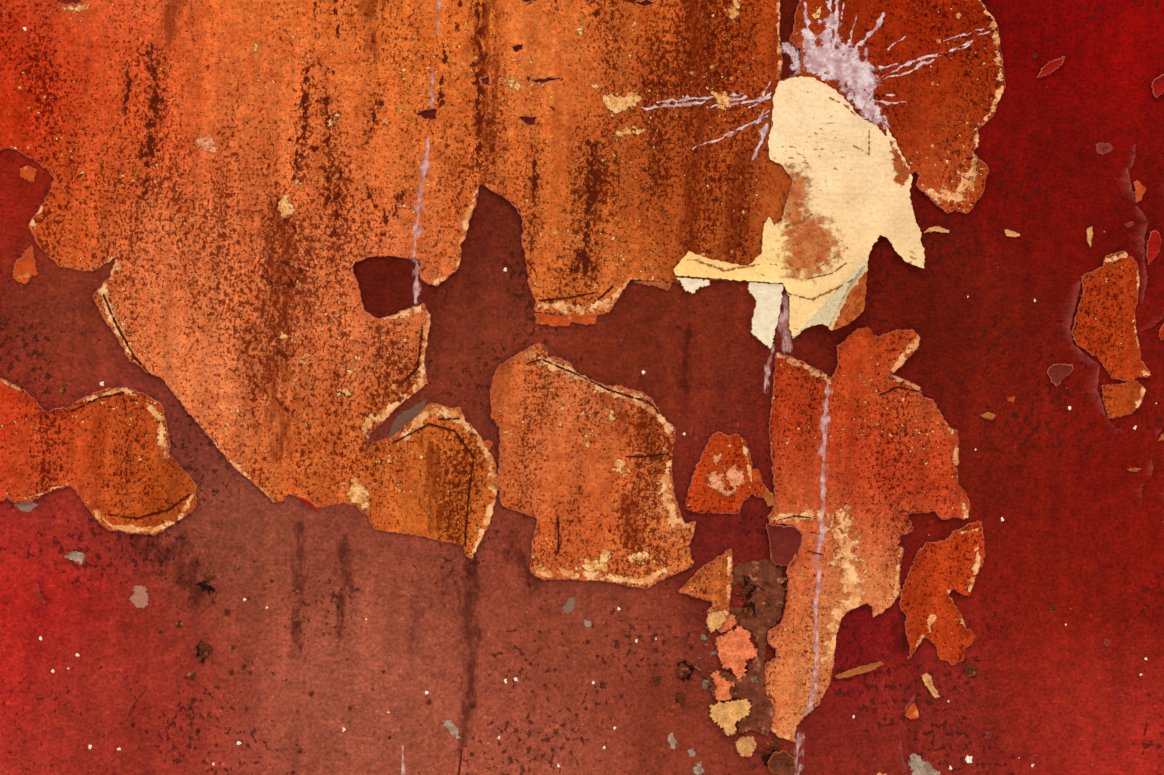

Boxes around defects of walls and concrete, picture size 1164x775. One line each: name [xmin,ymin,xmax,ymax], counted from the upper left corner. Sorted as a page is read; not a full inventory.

rust [123,65,133,114]
rust [138,41,168,196]
rust [288,61,343,238]
rust [367,187,405,243]
rust [436,46,452,108]
rust [455,0,491,166]
rust [528,149,539,197]
rust [568,137,611,280]
peeling [0,0,1006,589]
peeling [1071,230,1161,419]
peeling [675,327,985,757]
flaking render [761,749,797,775]